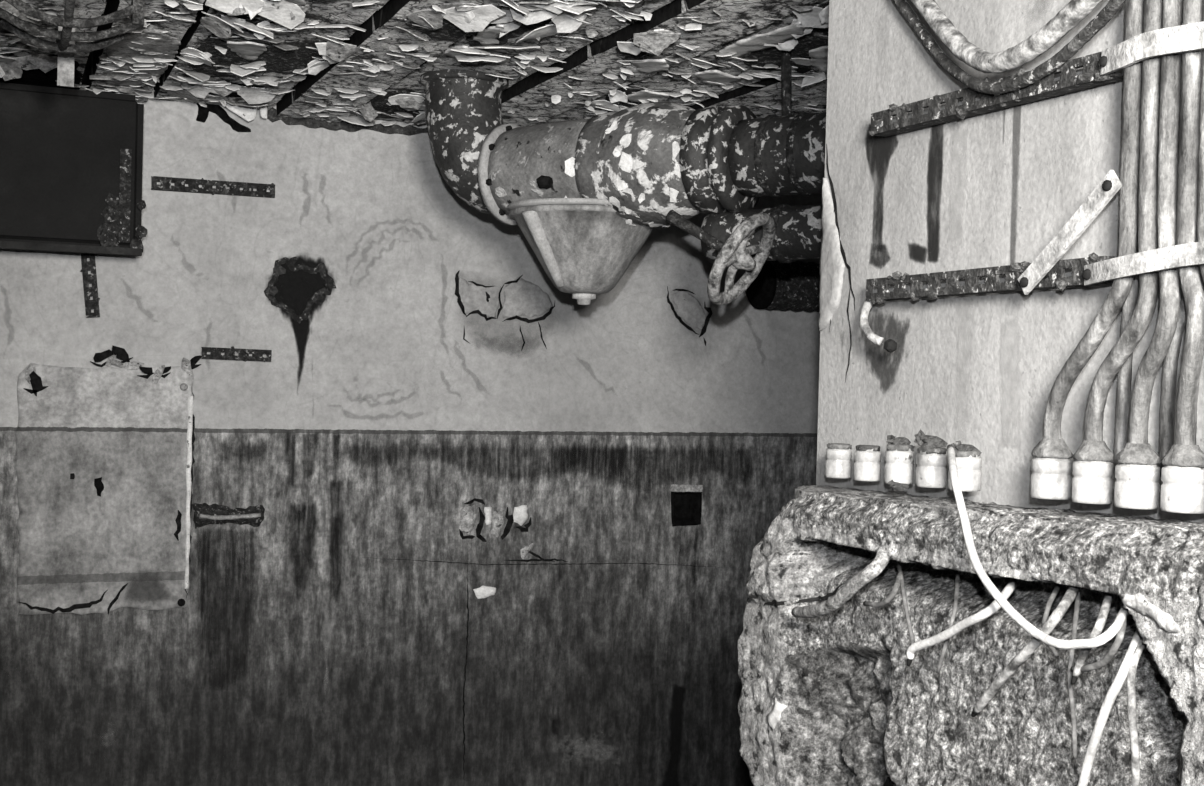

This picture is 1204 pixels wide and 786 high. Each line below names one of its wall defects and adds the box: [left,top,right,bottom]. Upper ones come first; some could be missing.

corrosion [866,103,906,280]
corrosion [909,123,943,262]
flaking render [455,270,555,351]
flaking render [667,286,713,346]
peeling [23,363,48,394]
peeling [90,346,202,400]
spalling [459,498,555,562]
crack [107,583,128,615]
leakage [128,574,168,601]
spalling [1120,593,1181,632]
leakage [663,686,685,786]
leakage [767,698,787,731]